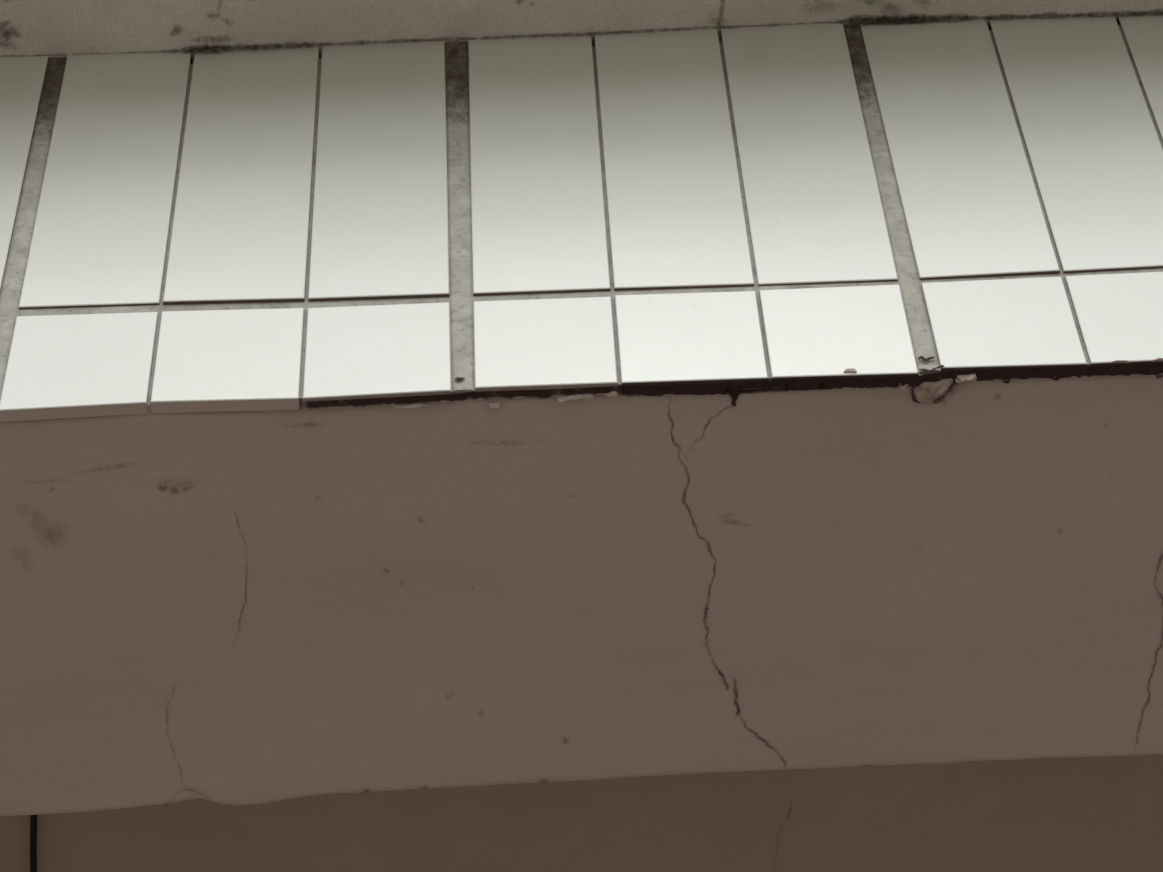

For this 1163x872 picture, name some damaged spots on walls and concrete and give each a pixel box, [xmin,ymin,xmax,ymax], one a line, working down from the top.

spalling [898,356,977,405]
crack [717,668,773,749]